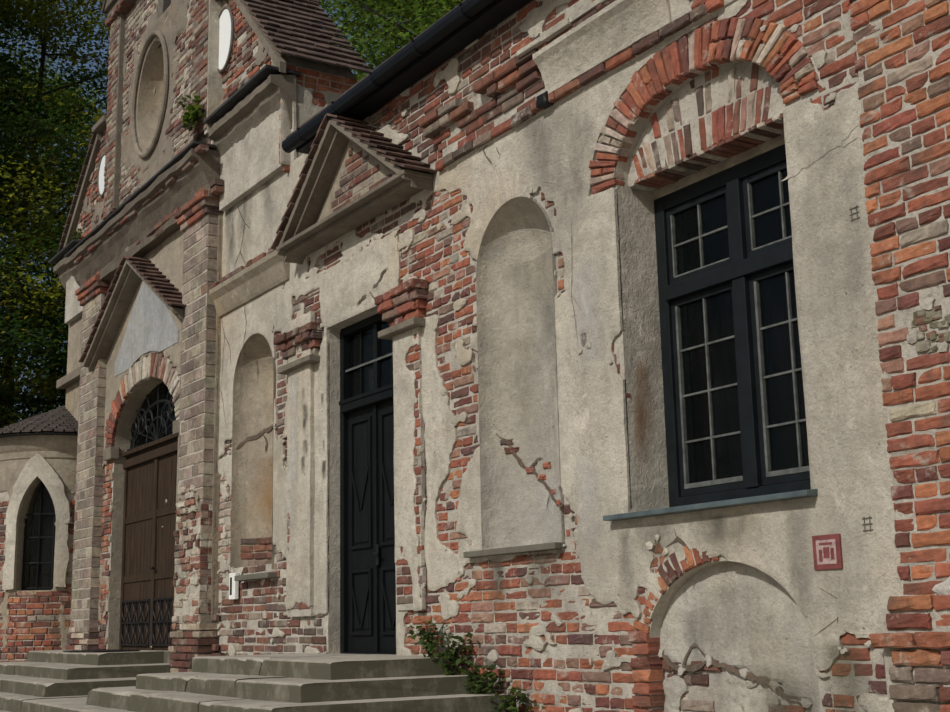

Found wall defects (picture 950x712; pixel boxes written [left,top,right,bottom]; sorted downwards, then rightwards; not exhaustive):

spalling [368,0,579,164]
spalling [730,0,858,110]
crack [218,307,273,457]
spalling [292,288,324,343]
spalling [309,189,480,554]
crack [496,433,563,510]
spalling [0,501,72,662]
spalling [165,475,327,656]
spalling [404,504,648,712]
spalling [645,534,669,578]
spalling [658,649,722,712]